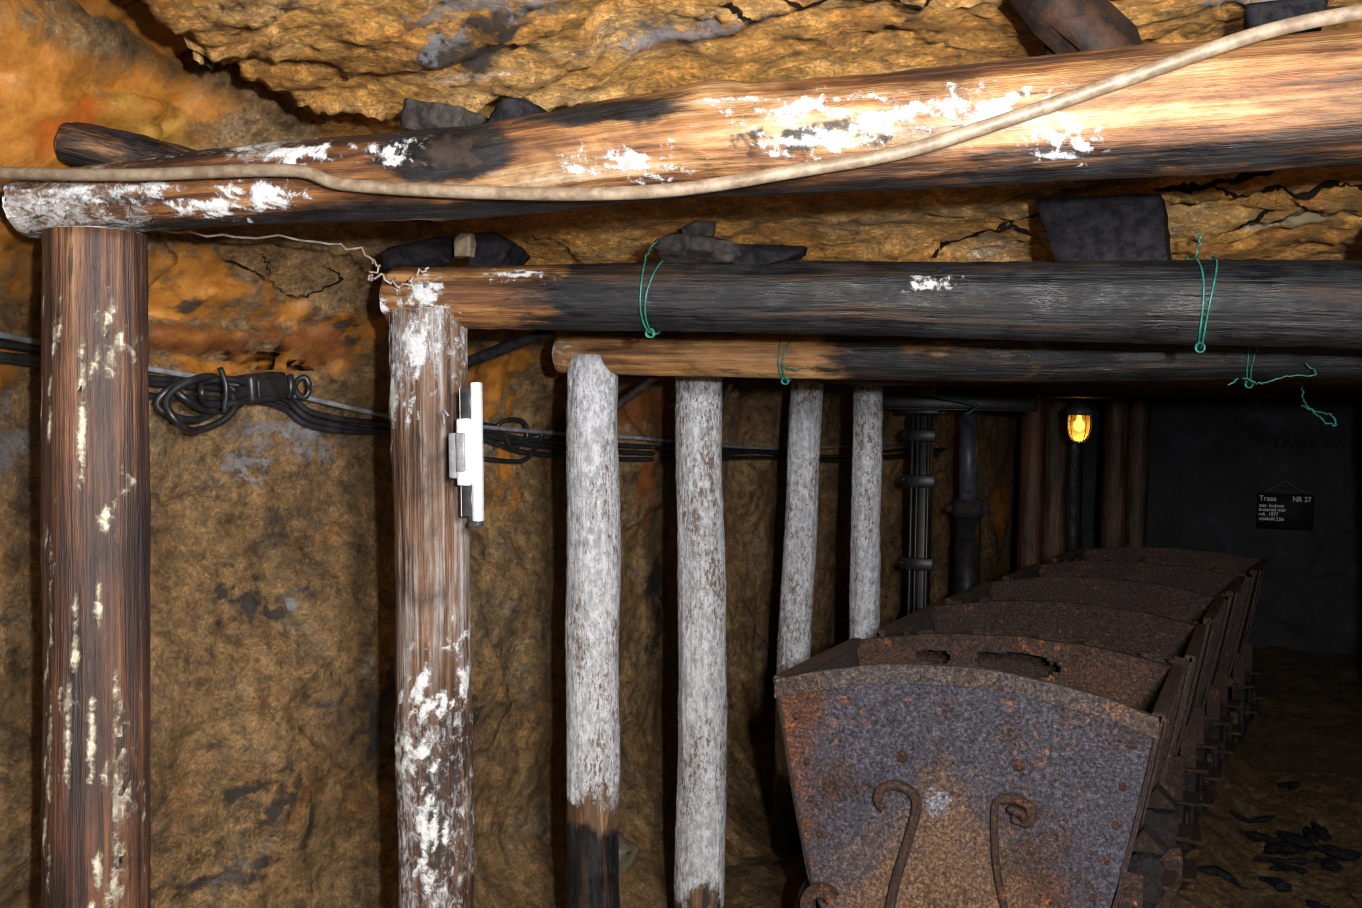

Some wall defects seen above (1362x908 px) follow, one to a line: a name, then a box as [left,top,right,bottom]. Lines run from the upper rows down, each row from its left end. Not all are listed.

damp [264,138,330,164]
damp [703,82,1033,160]
damp [1022,111,1102,166]
damp [2,177,311,229]
damp [365,630,486,897]